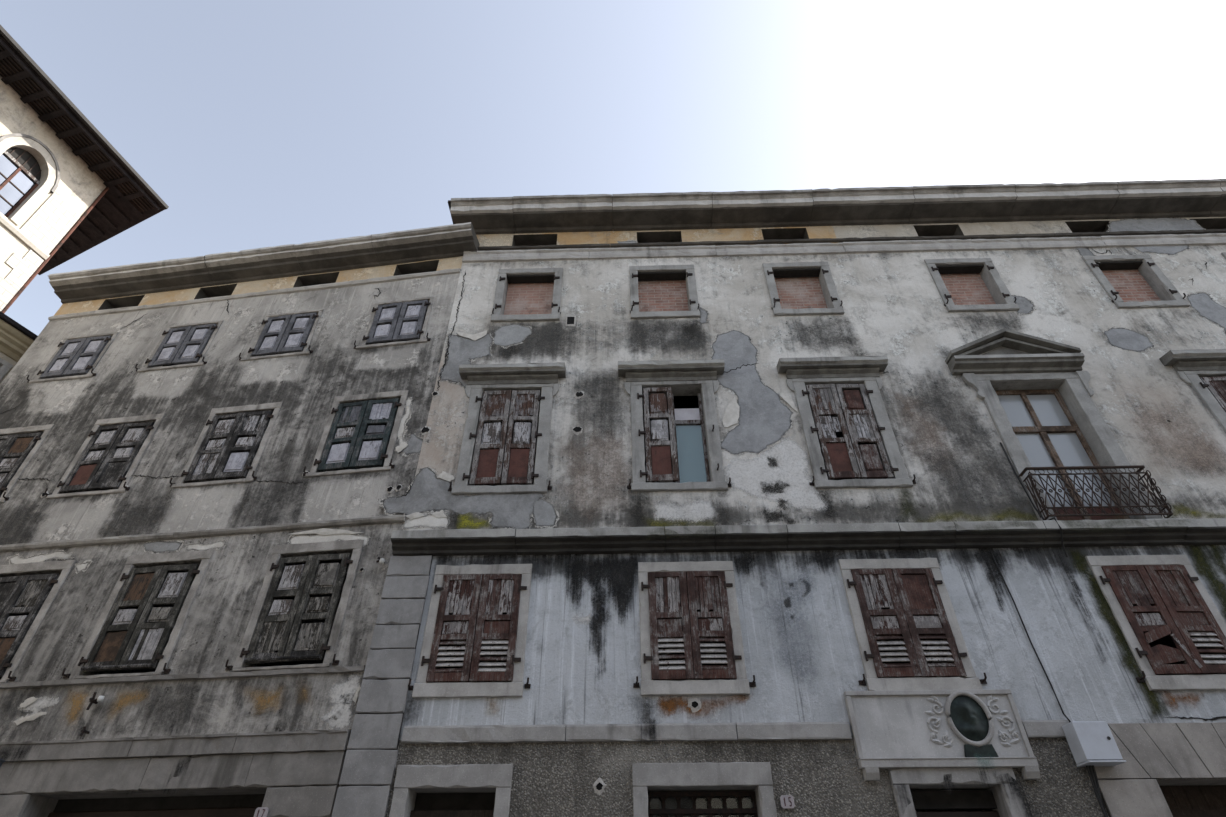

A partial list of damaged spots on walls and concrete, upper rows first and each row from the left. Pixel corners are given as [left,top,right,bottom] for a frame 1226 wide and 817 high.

crack [437,271,466,391]
peeling [722,397,739,427]
peeling [780,390,798,412]
damp [896,381,1020,498]
flaking render [401,510,450,530]
damp [442,554,637,662]
flaking render [11,697,59,726]
flaking render [320,675,361,729]